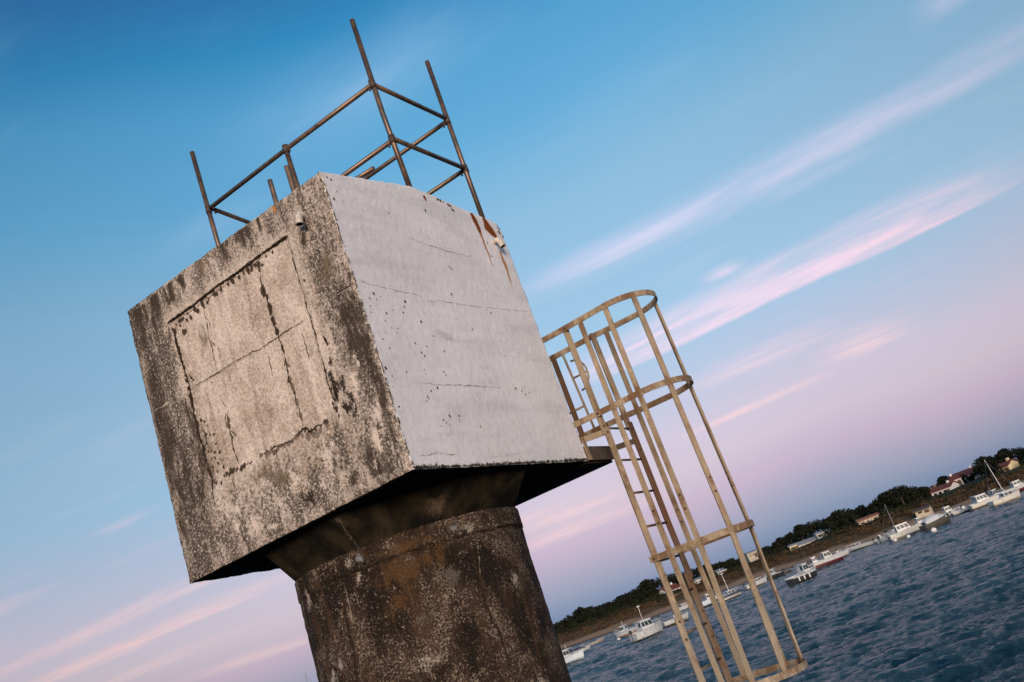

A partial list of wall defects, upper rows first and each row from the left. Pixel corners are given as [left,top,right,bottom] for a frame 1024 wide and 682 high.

water stain [220,217,263,263]
rust [470,213,511,282]
water stain [133,273,185,352]
crack [154,235,340,507]
water stain [147,361,219,553]